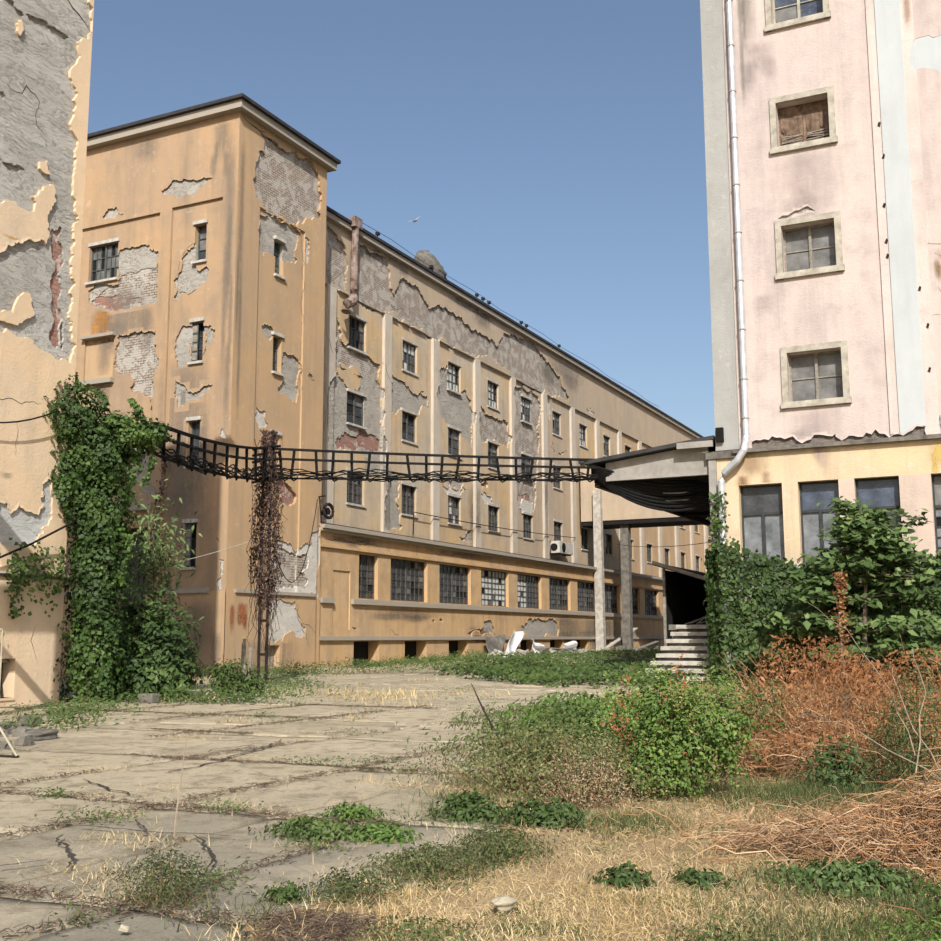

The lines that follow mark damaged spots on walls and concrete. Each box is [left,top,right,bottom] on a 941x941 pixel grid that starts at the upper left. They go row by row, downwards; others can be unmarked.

flaking render [0,0,91,362]
flaking render [88,243,159,312]
flaking render [115,329,159,398]
flaking render [174,324,215,407]
flaking render [253,131,570,531]
flaking render [752,424,926,448]
flaking render [0,476,53,548]
corrosion [230,604,247,627]
flaking render [268,523,320,643]
flaking render [521,617,559,637]